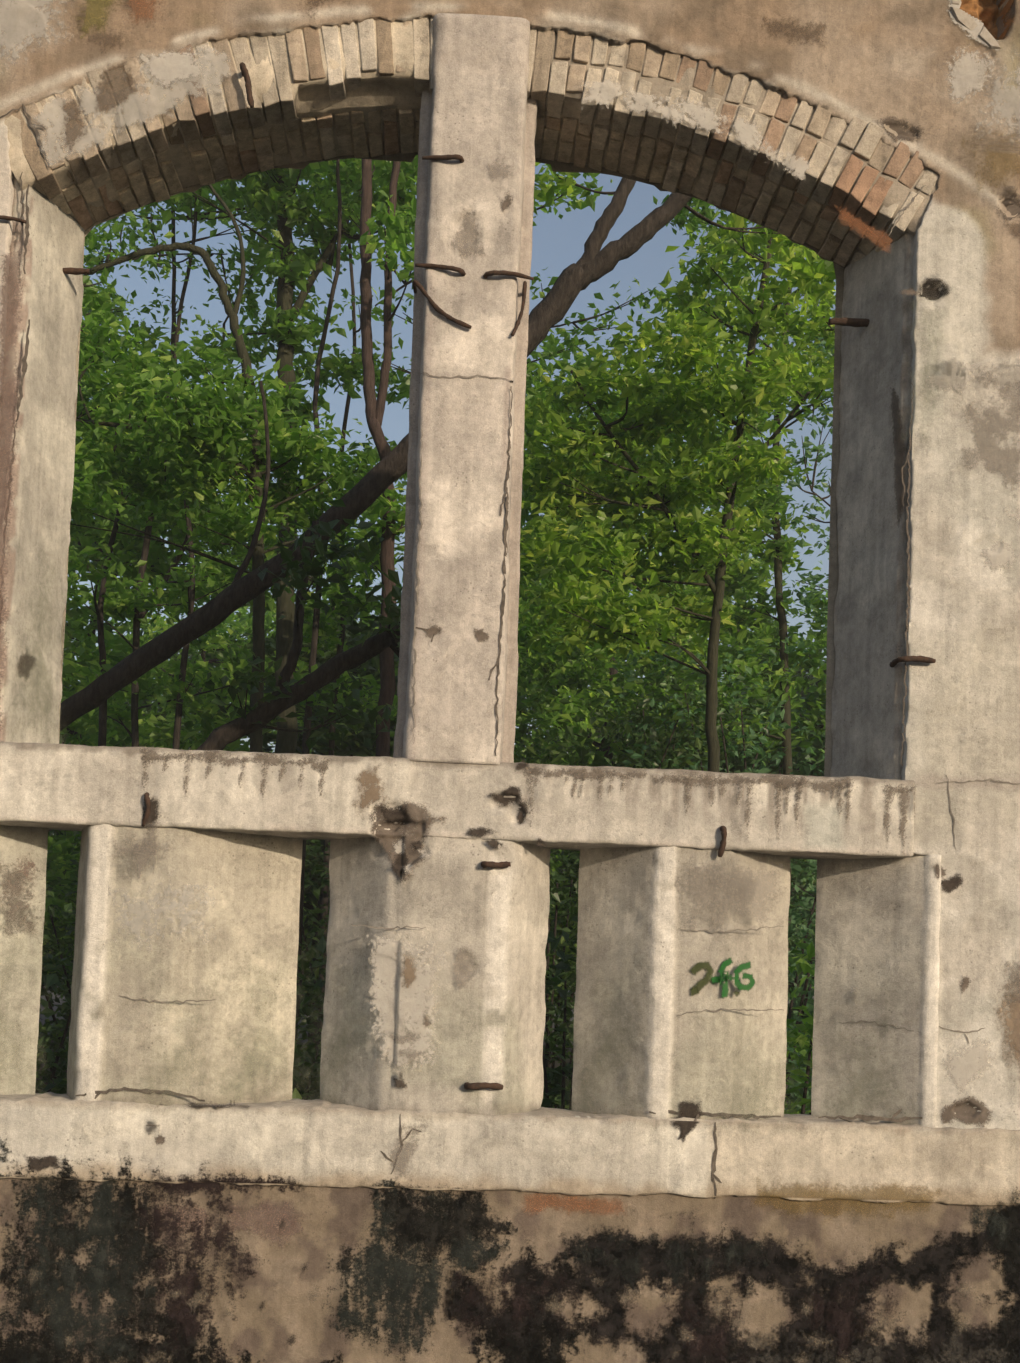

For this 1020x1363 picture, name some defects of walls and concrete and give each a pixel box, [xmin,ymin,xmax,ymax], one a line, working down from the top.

peeling [38,49,229,165]
peeling [584,78,809,179]
spalling [880,117,924,141]
spalling [948,0,1020,136]
spalling [901,278,950,300]
leakage [140,746,329,796]
spalling [354,765,447,881]
crack [649,1110,781,1199]
crack [818,1108,922,1123]
spalling [941,1096,991,1127]
leakage [0,1137,301,1363]
leakage [321,1125,1020,1363]